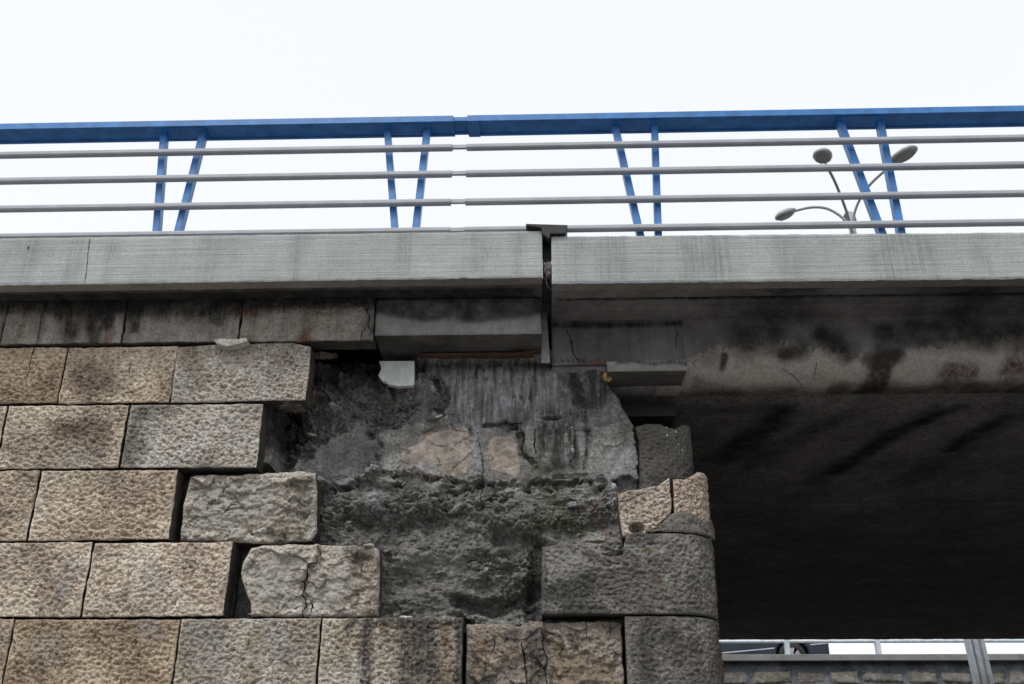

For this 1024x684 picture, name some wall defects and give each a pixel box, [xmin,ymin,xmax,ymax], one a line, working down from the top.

damp [0,289,541,343]
damp [566,288,1024,394]
damp [421,361,612,478]
spalling [315,375,616,618]
damp [604,448,632,501]
crack [619,428,674,524]
spalling [250,551,305,610]
crack [272,545,321,617]